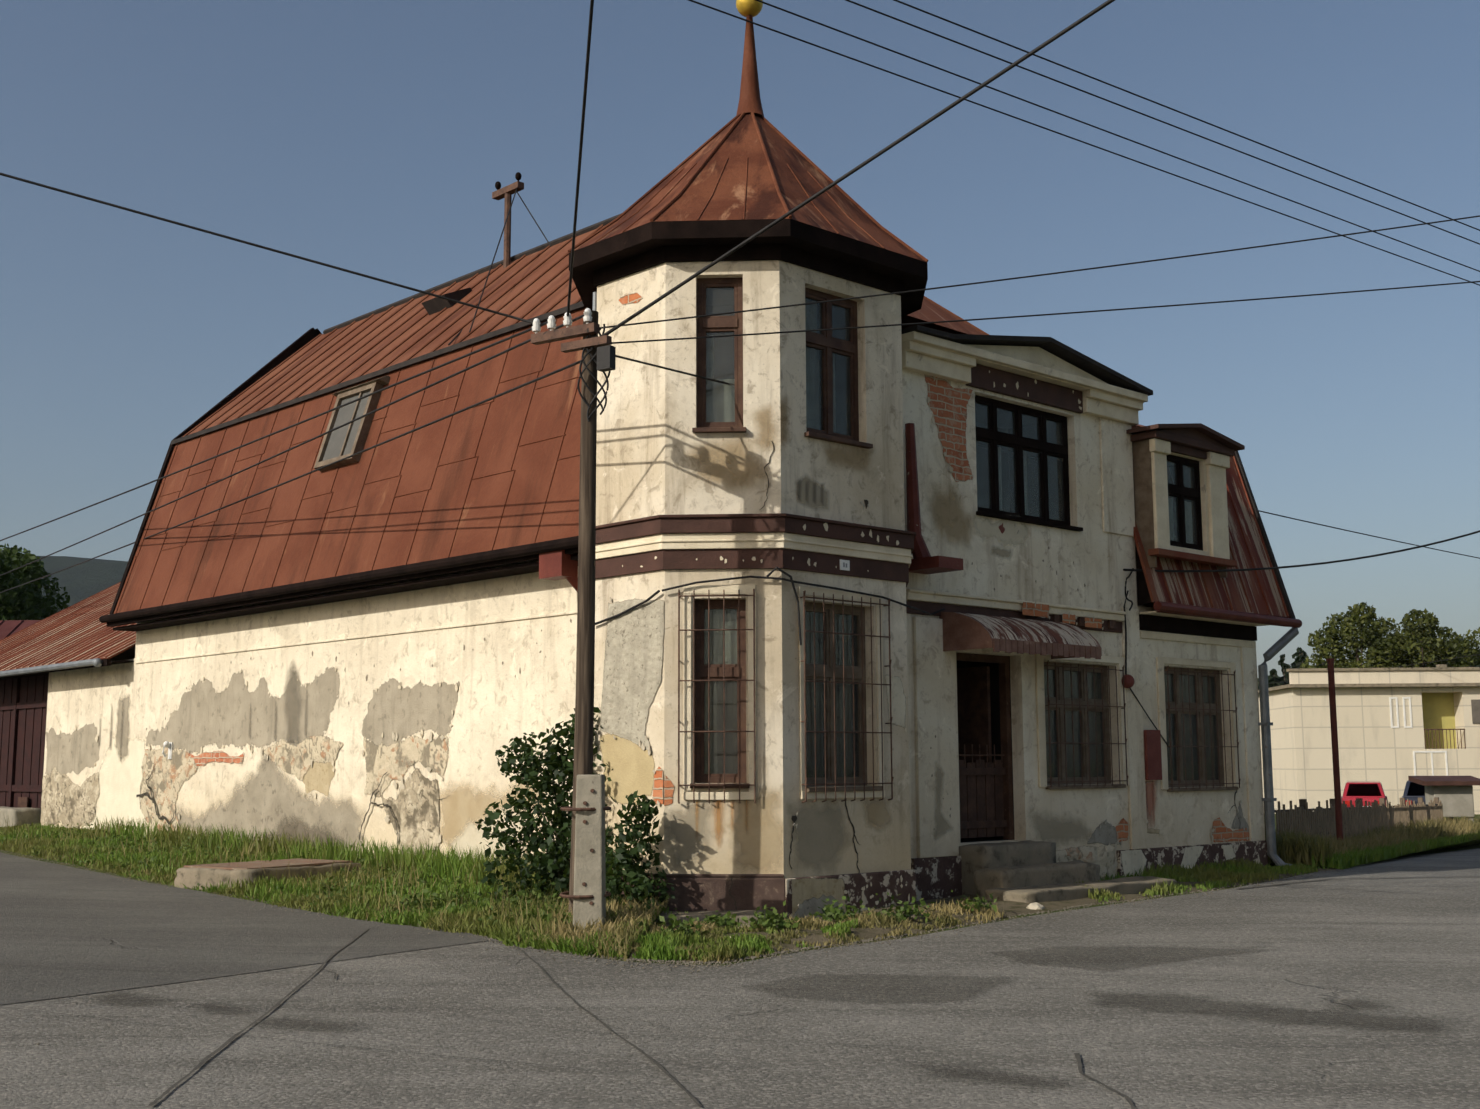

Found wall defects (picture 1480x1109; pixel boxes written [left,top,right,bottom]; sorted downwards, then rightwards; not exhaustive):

flaking render [924,374,975,486]
flaking render [41,724,100,828]
peeling [139,653,357,833]
peeling [362,664,527,861]
flaking render [600,597,674,806]
rust [716,800,747,838]
flaking render [793,875,910,918]